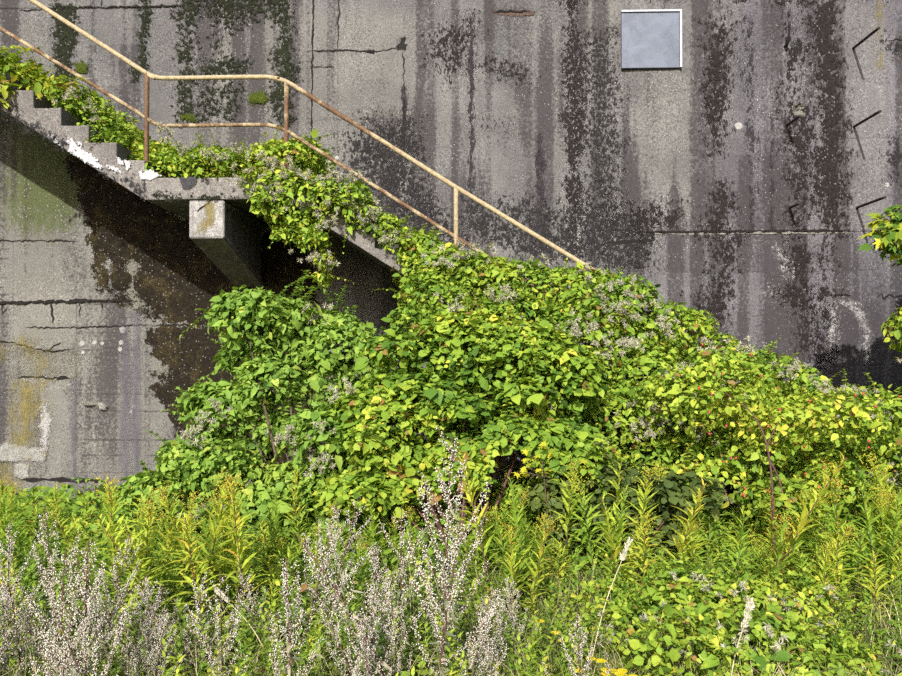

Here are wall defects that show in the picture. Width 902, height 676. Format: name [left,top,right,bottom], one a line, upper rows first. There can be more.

damp [875,28,902,61]
crack [306,0,406,151]
damp [98,167,148,201]
damp [331,0,870,374]
damp [875,134,902,188]
damp [201,203,214,230]
crack [0,298,212,352]
crack [19,374,69,382]